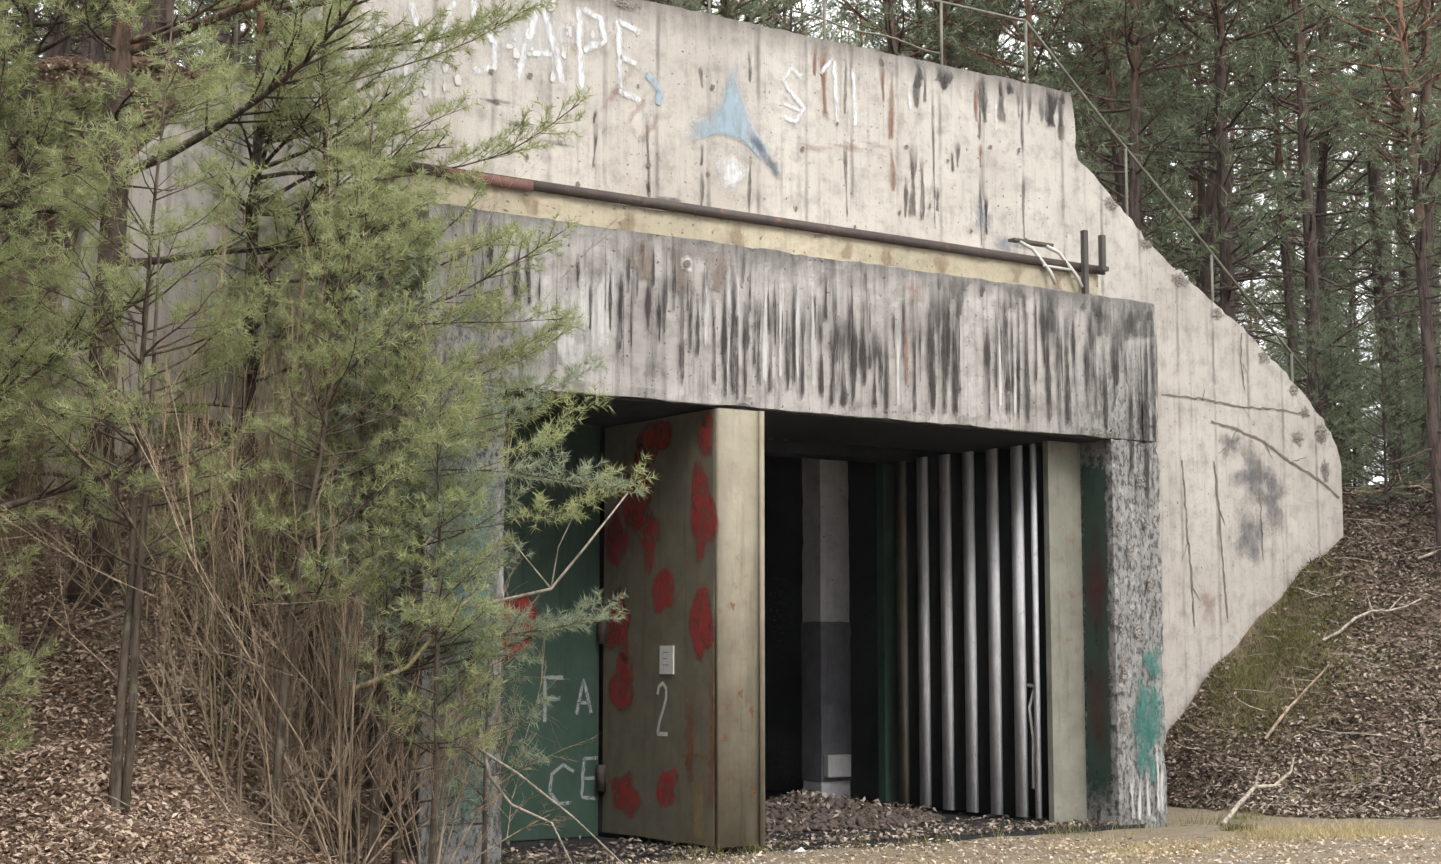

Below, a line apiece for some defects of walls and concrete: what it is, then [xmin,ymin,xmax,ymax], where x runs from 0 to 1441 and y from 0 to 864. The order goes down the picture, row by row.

leakage [913,72,953,108]
leakage [978,85,1063,142]
leakage [904,130,960,220]
leakage [979,191,1009,250]
leakage [472,223,558,364]
leakage [576,244,1158,515]
crack [1162,333,1340,627]